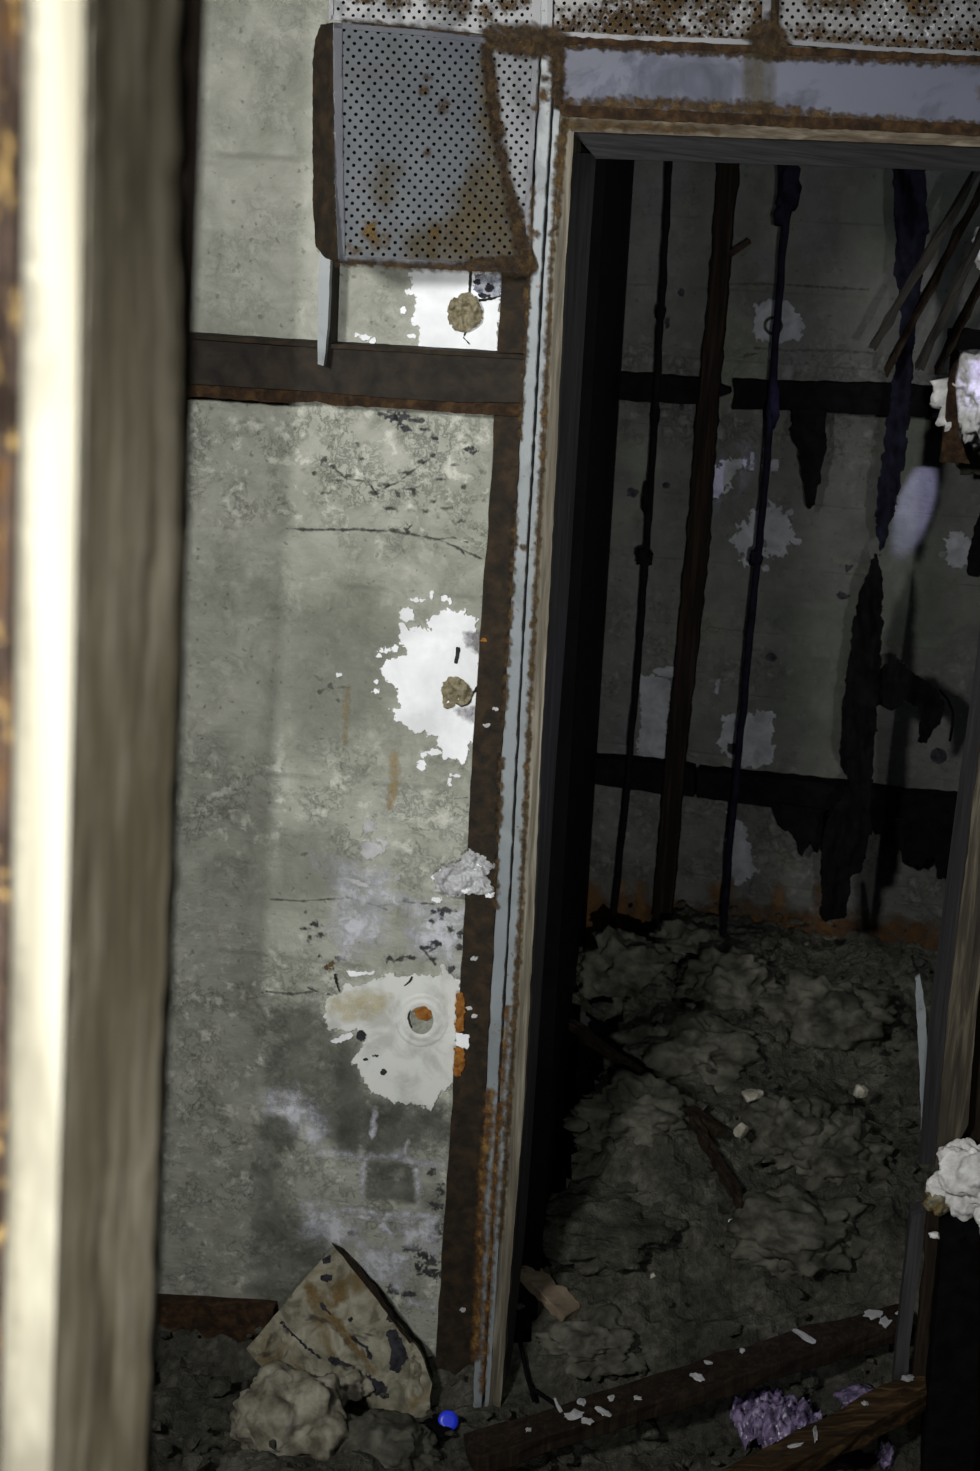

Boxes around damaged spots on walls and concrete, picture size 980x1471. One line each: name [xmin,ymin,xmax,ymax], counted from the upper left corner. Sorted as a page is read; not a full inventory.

spalling [473,272,502,299]
peeling [399,591,452,622]
peeling [376,644,399,658]
rust [334,0,980,1393]
peeling [331,1032,354,1044]
peeling [455,1032,470,1049]
rust [304,1281,373,1371]